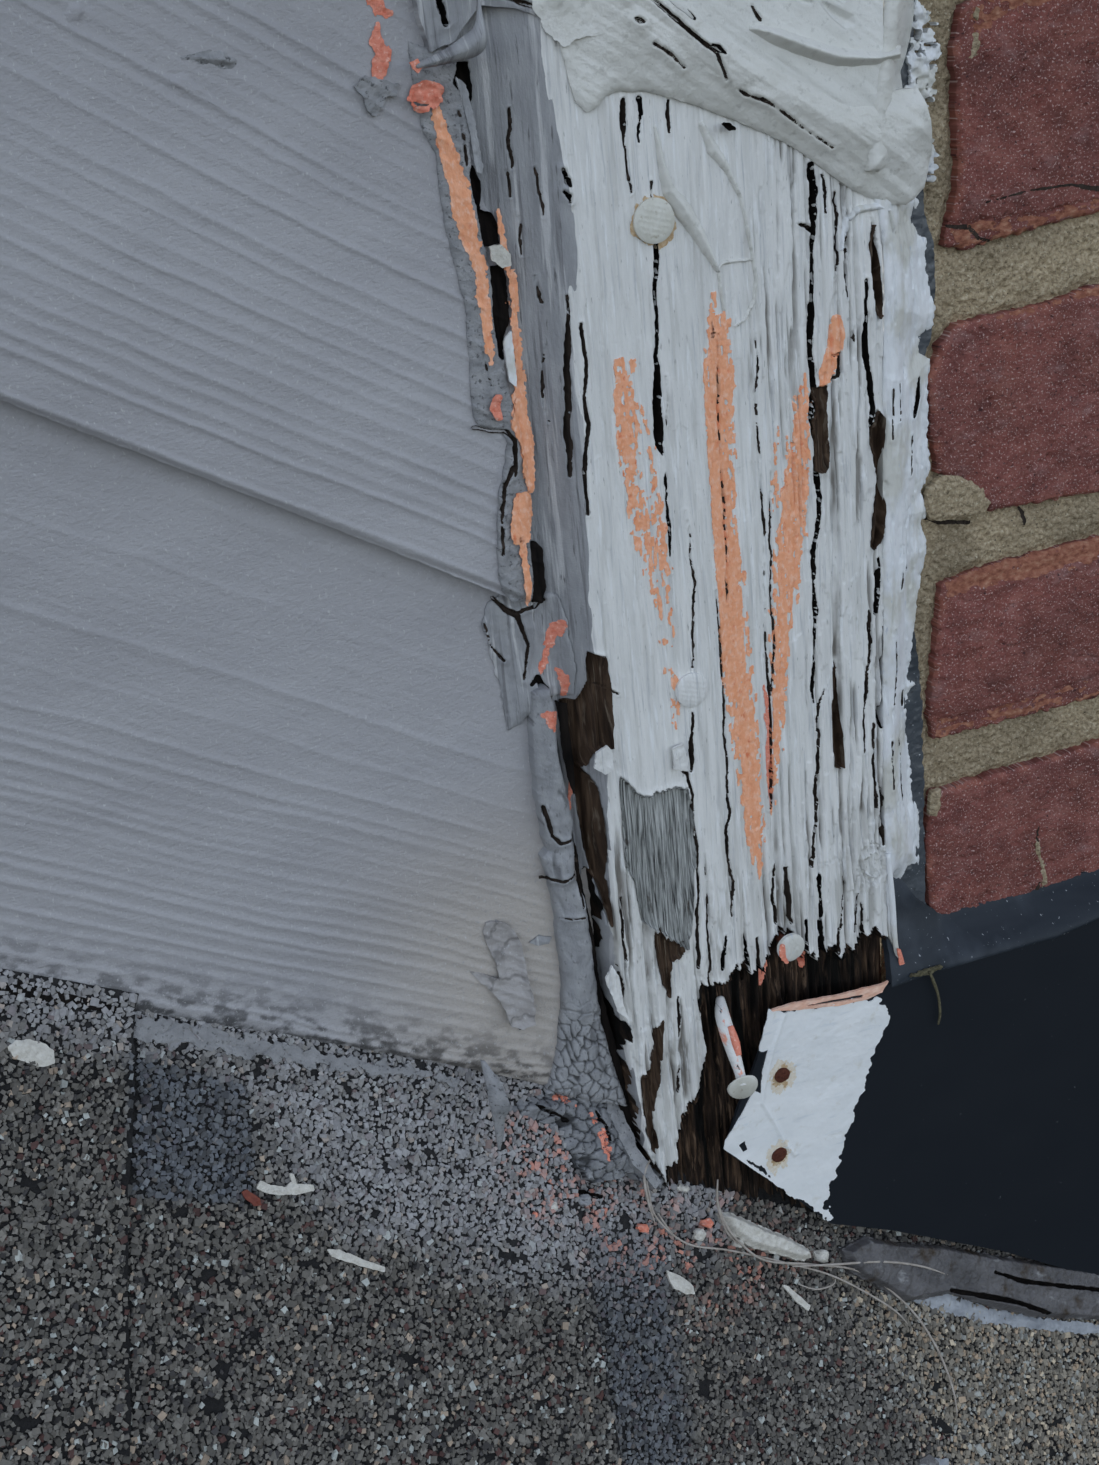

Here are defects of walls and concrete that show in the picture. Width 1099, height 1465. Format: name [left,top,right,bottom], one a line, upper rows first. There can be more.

crack [457,110,468,166]
peeling [489,244,512,268]
peeling [503,331,517,386]
crack [471,425,518,556]
crack [619,0,920,1093]
crack [483,596,549,688]
crack [539,805,628,997]
peeling [593,743,697,998]
peeling [605,965,629,1019]
peeling [641,1021,665,1154]
rust [767,1059,797,1095]
rust [766,1139,792,1177]